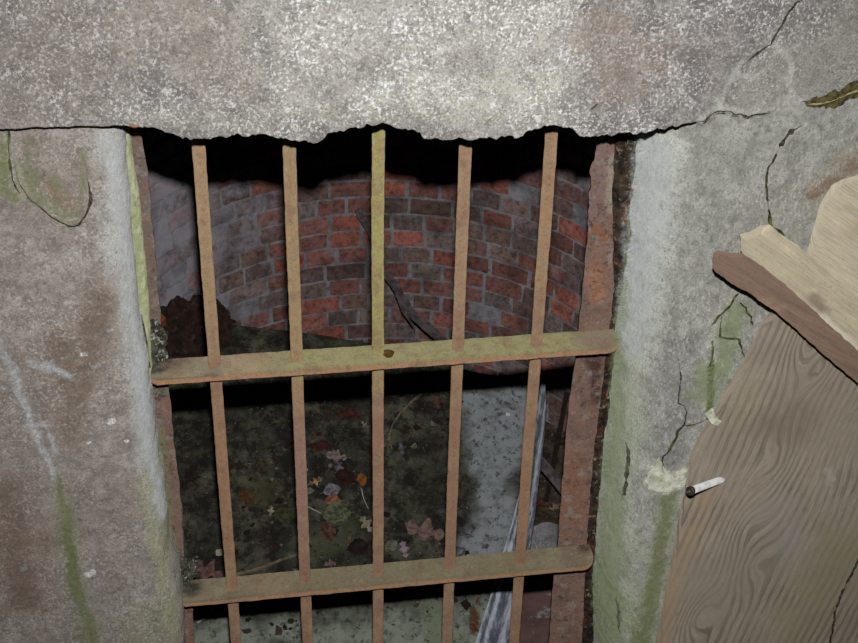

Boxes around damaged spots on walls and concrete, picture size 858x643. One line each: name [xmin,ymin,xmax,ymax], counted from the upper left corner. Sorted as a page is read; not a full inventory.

crack [698,0,808,236]
crack [7,129,20,193]
crack [707,293,753,369]
damp [596,132,667,643]
crack [661,372,708,470]
crack [622,442,630,496]
rust [469,588,483,635]